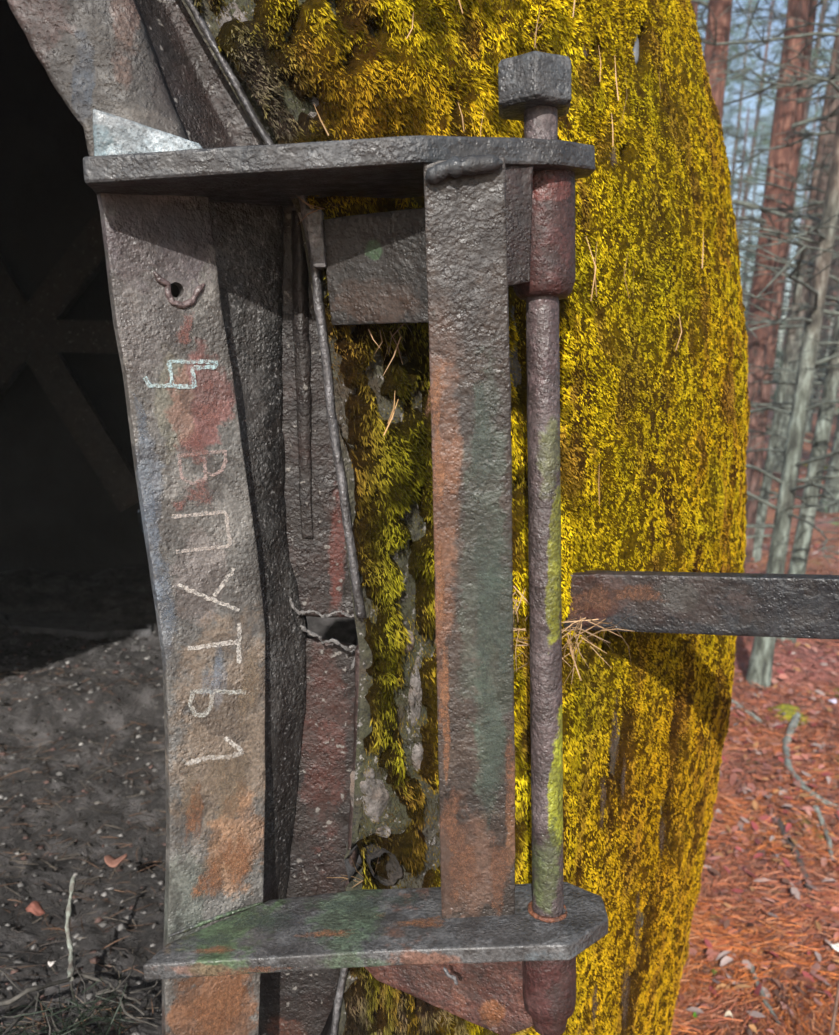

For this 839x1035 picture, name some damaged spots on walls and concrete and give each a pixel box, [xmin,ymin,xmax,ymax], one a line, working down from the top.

corrosion [428,369,445,506]
crack [289,597,356,670]
corrosion [567,585,662,617]
corrosion [435,543,476,900]